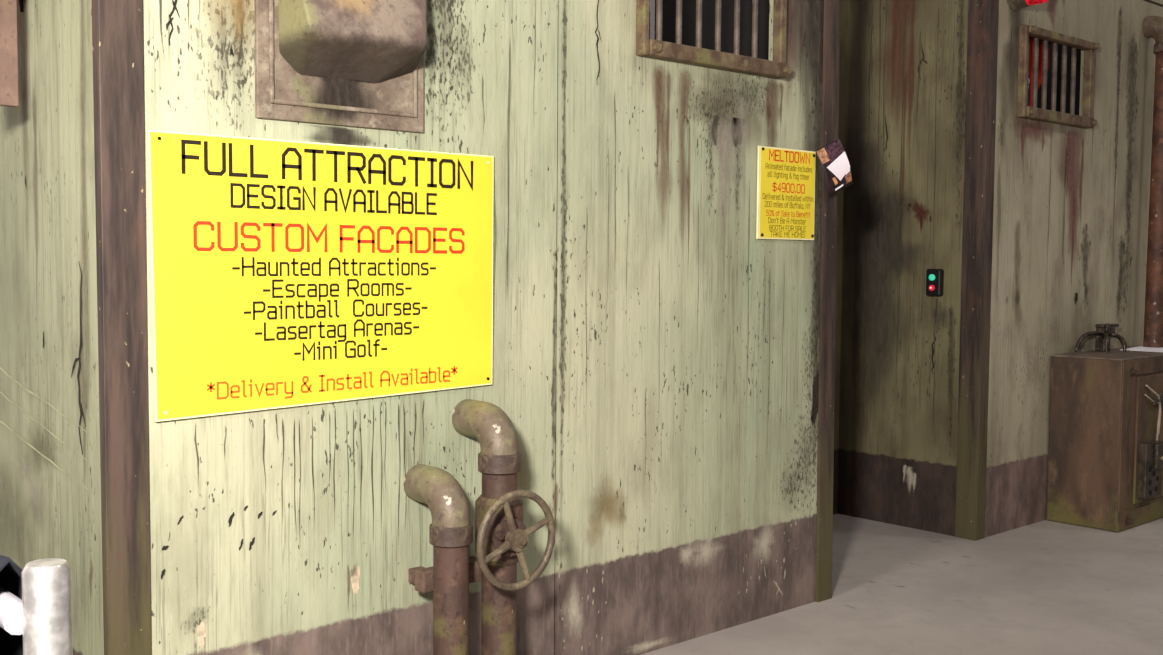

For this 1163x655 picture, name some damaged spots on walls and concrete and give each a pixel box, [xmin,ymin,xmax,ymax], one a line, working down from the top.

crack [166,0,180,42]
damp [217,0,250,98]
damp [315,127,364,145]
damp [324,76,359,111]
damp [426,0,484,128]
damp [494,180,509,295]
crack [594,0,602,78]
damp [608,97,629,206]
rust [656,72,690,247]
rust [768,83,783,139]
rust [1065,132,1084,260]
crack [71,261,86,455]